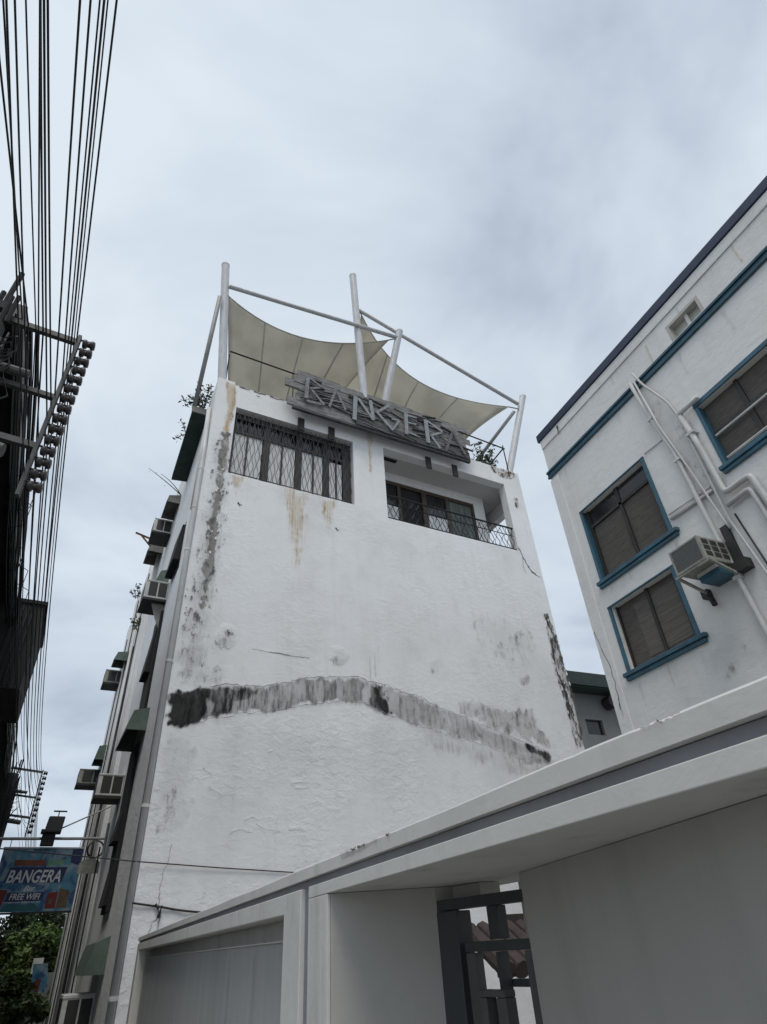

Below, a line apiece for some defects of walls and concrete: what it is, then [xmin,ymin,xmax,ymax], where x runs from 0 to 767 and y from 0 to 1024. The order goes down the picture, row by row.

leakage [167,676,550,765]